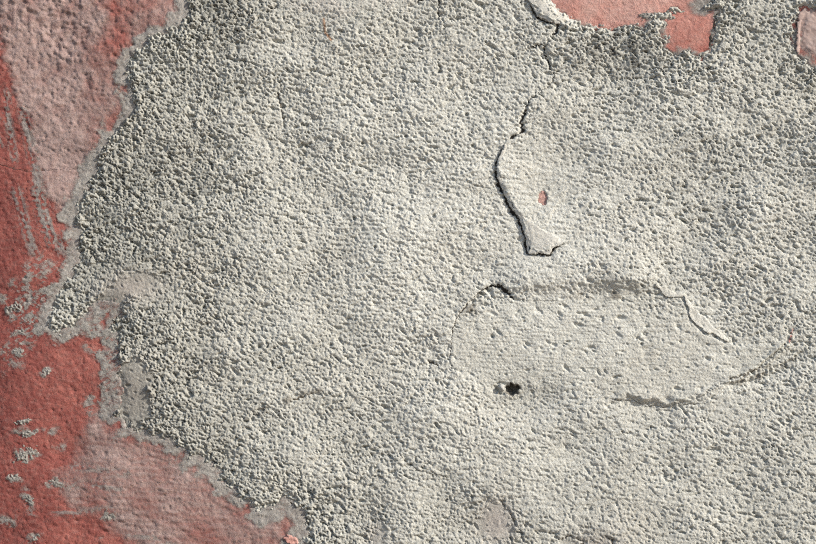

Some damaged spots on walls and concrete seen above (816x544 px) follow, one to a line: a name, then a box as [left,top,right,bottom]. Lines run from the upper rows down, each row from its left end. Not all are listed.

peeling [528,0,574,24]
peeling [795,8,816,54]
crack [494,3,559,257]
peeling [496,144,563,255]
crack [427,284,514,366]
spalling [451,283,786,405]